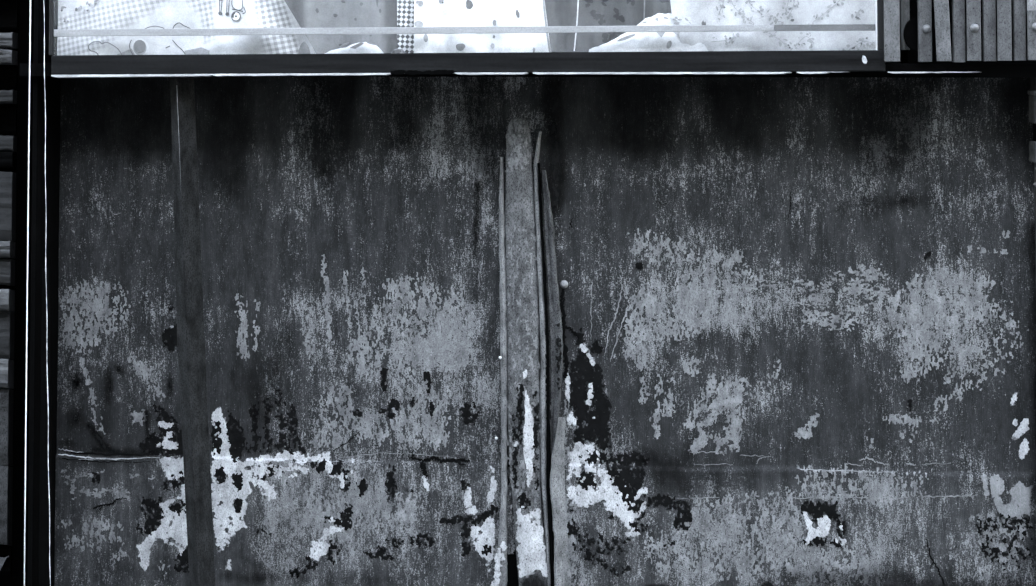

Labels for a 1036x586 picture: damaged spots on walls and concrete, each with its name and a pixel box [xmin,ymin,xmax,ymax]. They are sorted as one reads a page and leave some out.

leakage [541,79,565,219]
peeling [210,254,482,578]
peeling [439,221,929,586]
peeling [620,228,1030,460]
peeling [969,474,1033,570]